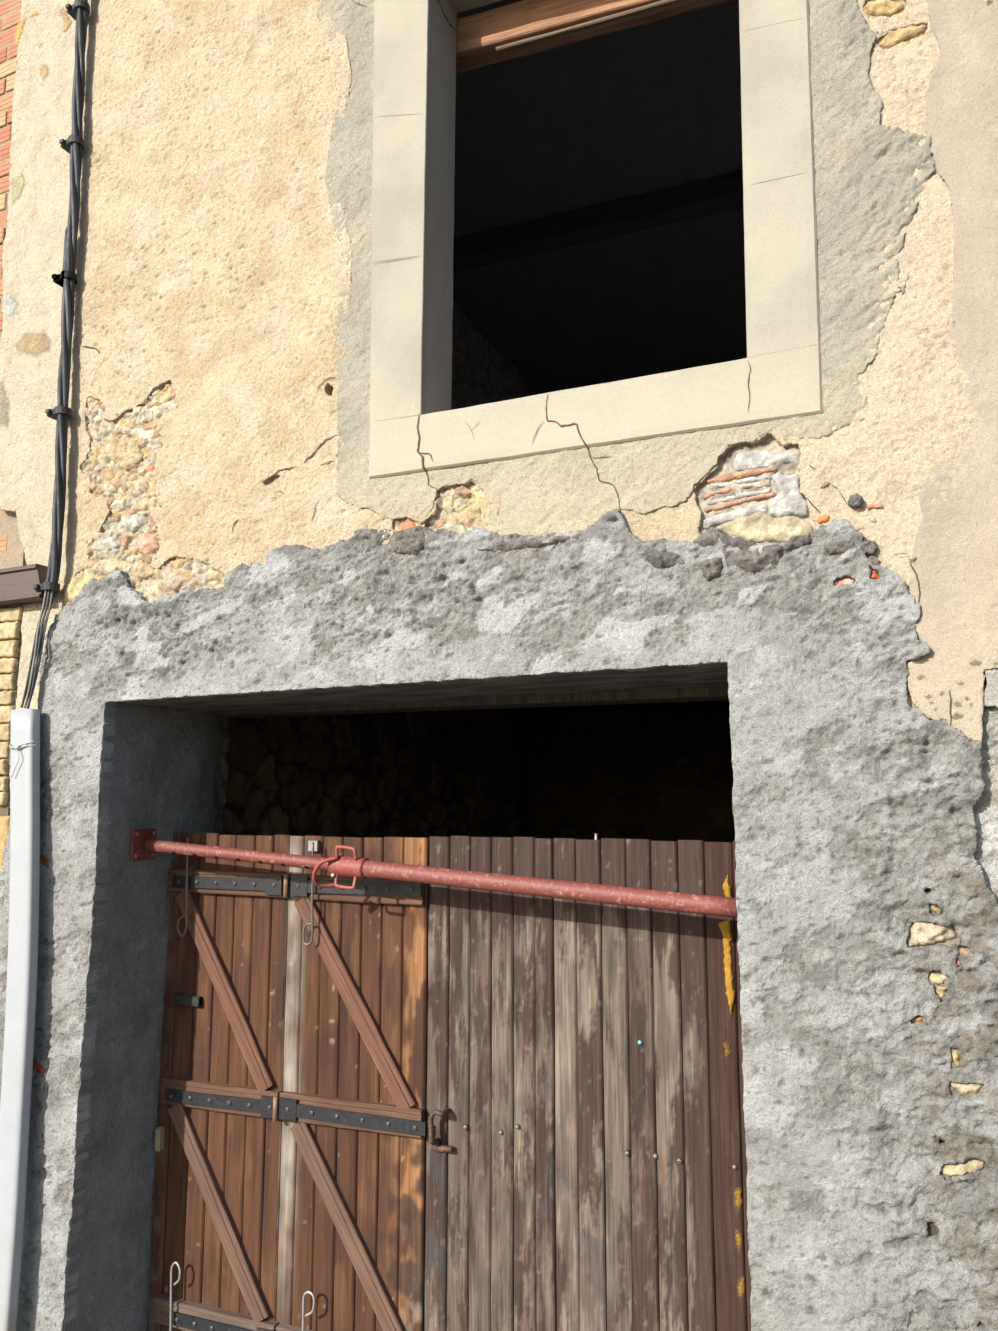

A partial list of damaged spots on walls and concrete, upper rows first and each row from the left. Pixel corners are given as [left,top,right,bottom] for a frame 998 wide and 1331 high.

flaking render [863,0,928,55]
flaking render [61,382,225,605]
crack [417,415,435,488]
crack [533,394,621,511]
flaking render [695,436,830,545]